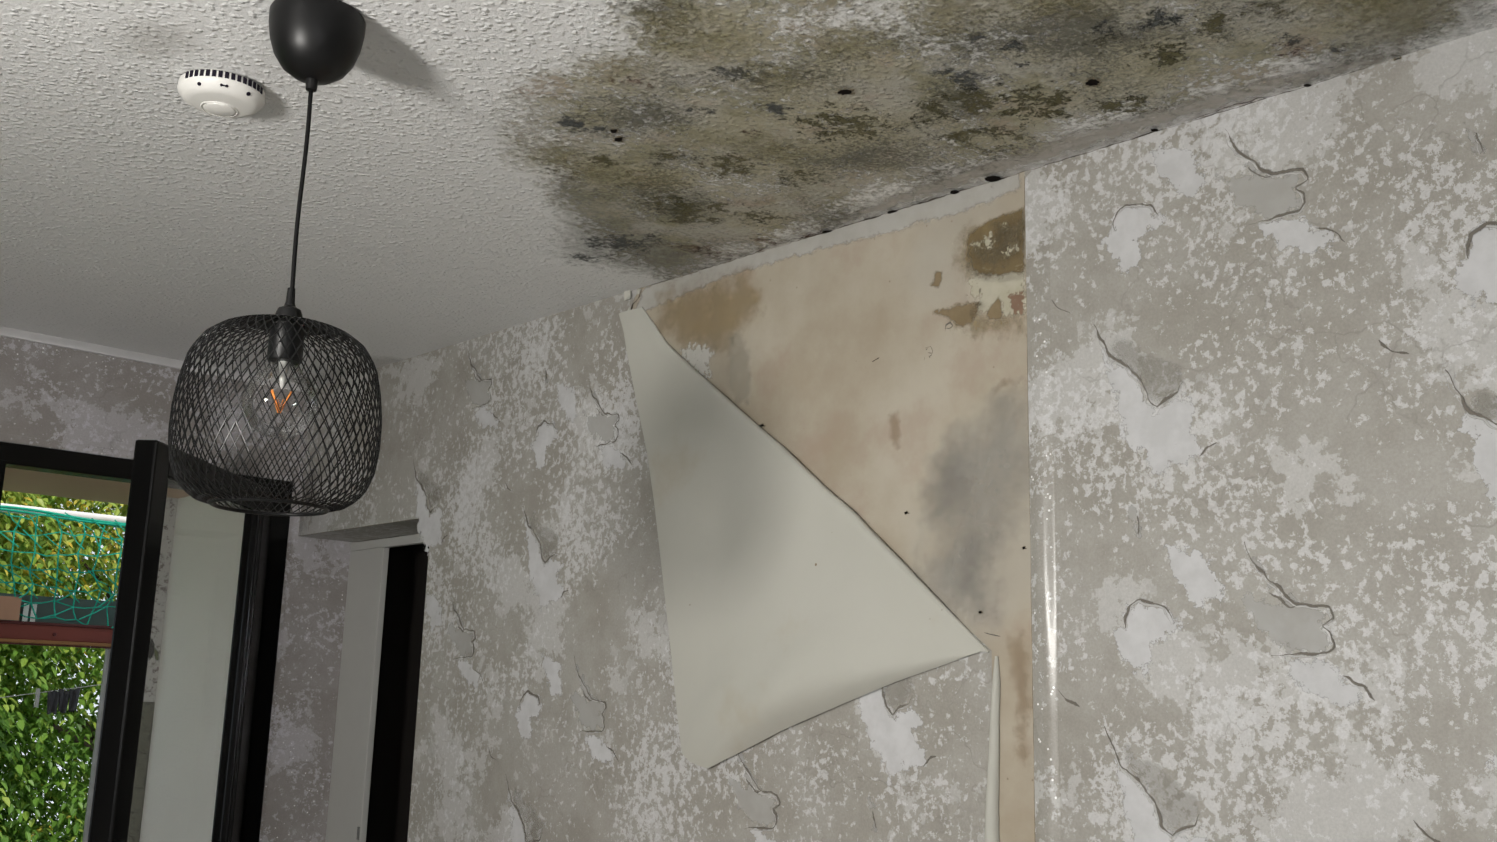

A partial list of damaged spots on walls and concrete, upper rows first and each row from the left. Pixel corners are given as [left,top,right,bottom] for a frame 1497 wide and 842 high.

leakage [502,0,1474,279]
peeling [1150,130,1345,255]
leakage [934,299,1006,331]
peeling [1454,219,1497,308]
peeling [530,383,631,470]
peeling [1093,325,1217,487]
peeling [1443,369,1497,508]
peeling [506,484,568,611]
peeling [1113,599,1183,678]
peeling [1163,541,1375,708]
peeling [857,688,936,786]
peeling [1104,726,1209,842]